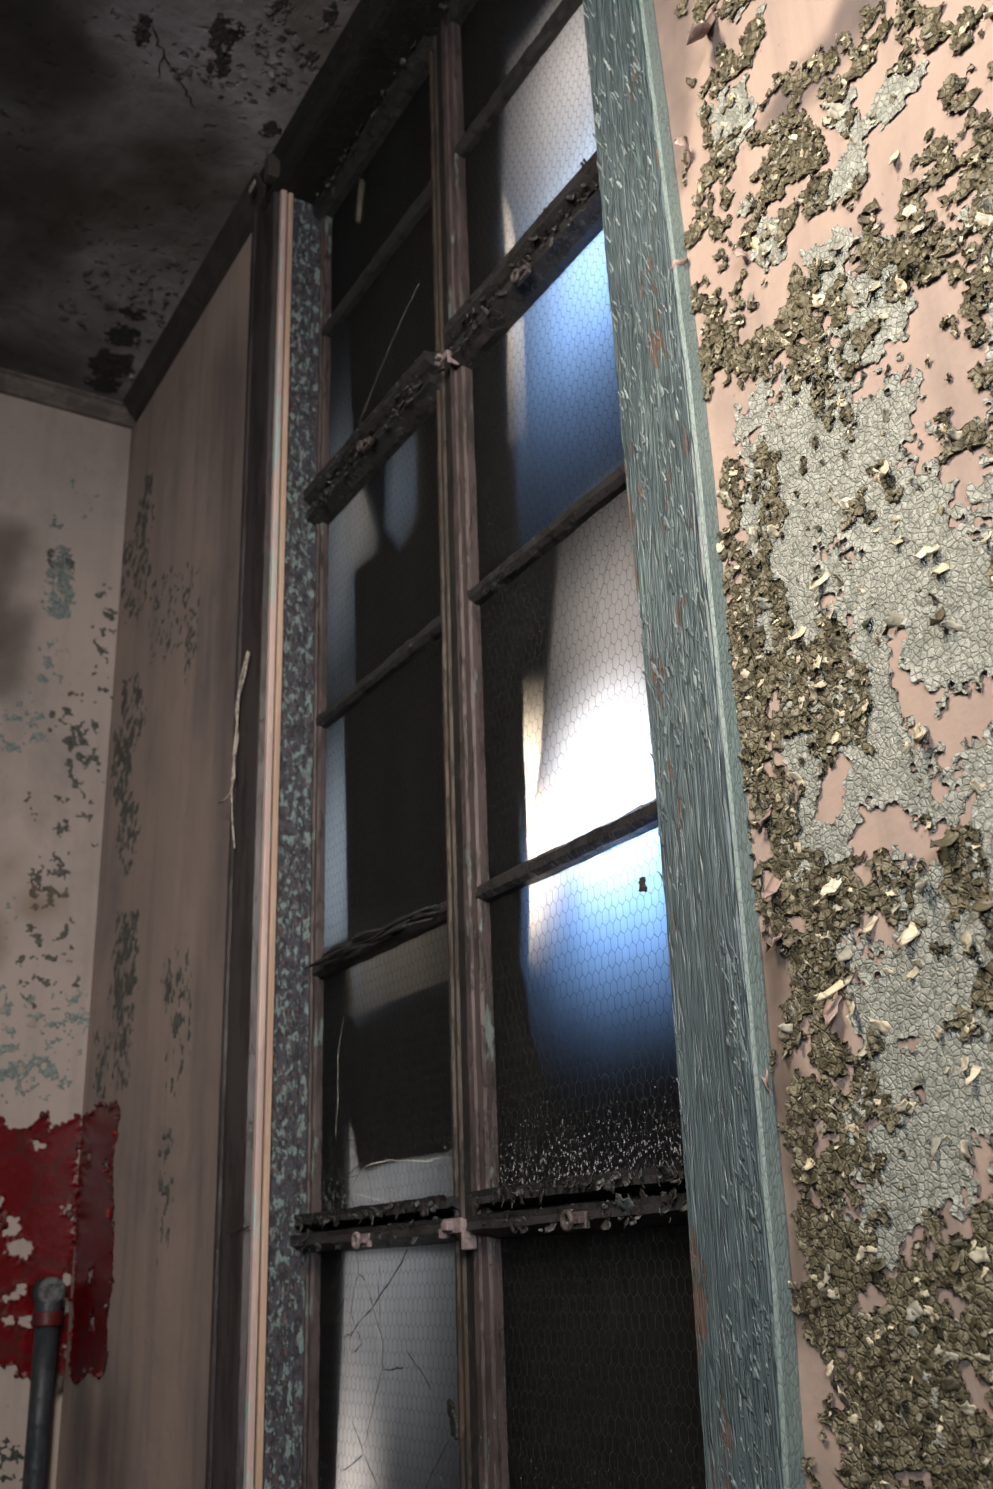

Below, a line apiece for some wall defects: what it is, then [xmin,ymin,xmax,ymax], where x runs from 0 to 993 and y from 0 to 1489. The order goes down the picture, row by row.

leakage [0,0,100,101]
peeling [0,473,200,1138]
peeling [670,0,993,1489]